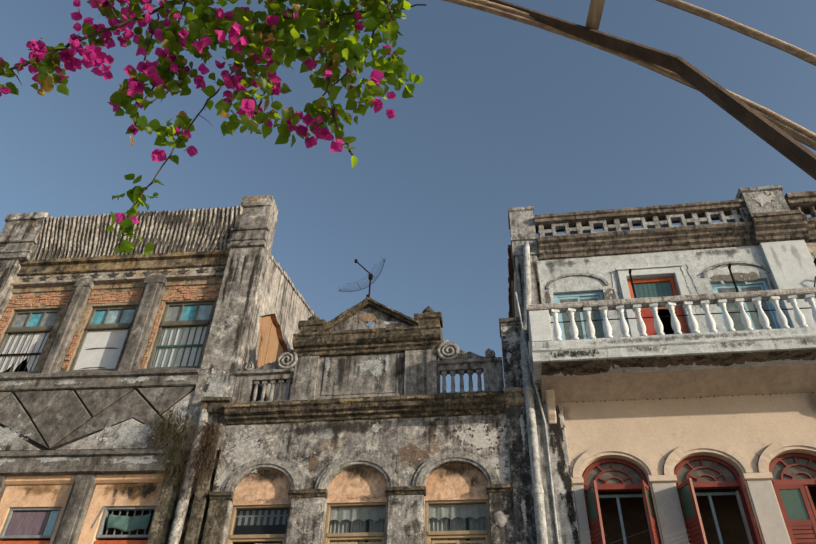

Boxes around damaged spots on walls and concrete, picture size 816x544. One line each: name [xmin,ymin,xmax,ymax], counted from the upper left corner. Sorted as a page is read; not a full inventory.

leakage [237,254,258,340]
leakage [546,332,761,358]
leakage [277,420,396,444]
leakage [249,470,282,482]
leakage [348,467,376,478]
leakage [439,465,478,486]
leakage [547,404,580,544]
leakage [106,483,156,504]